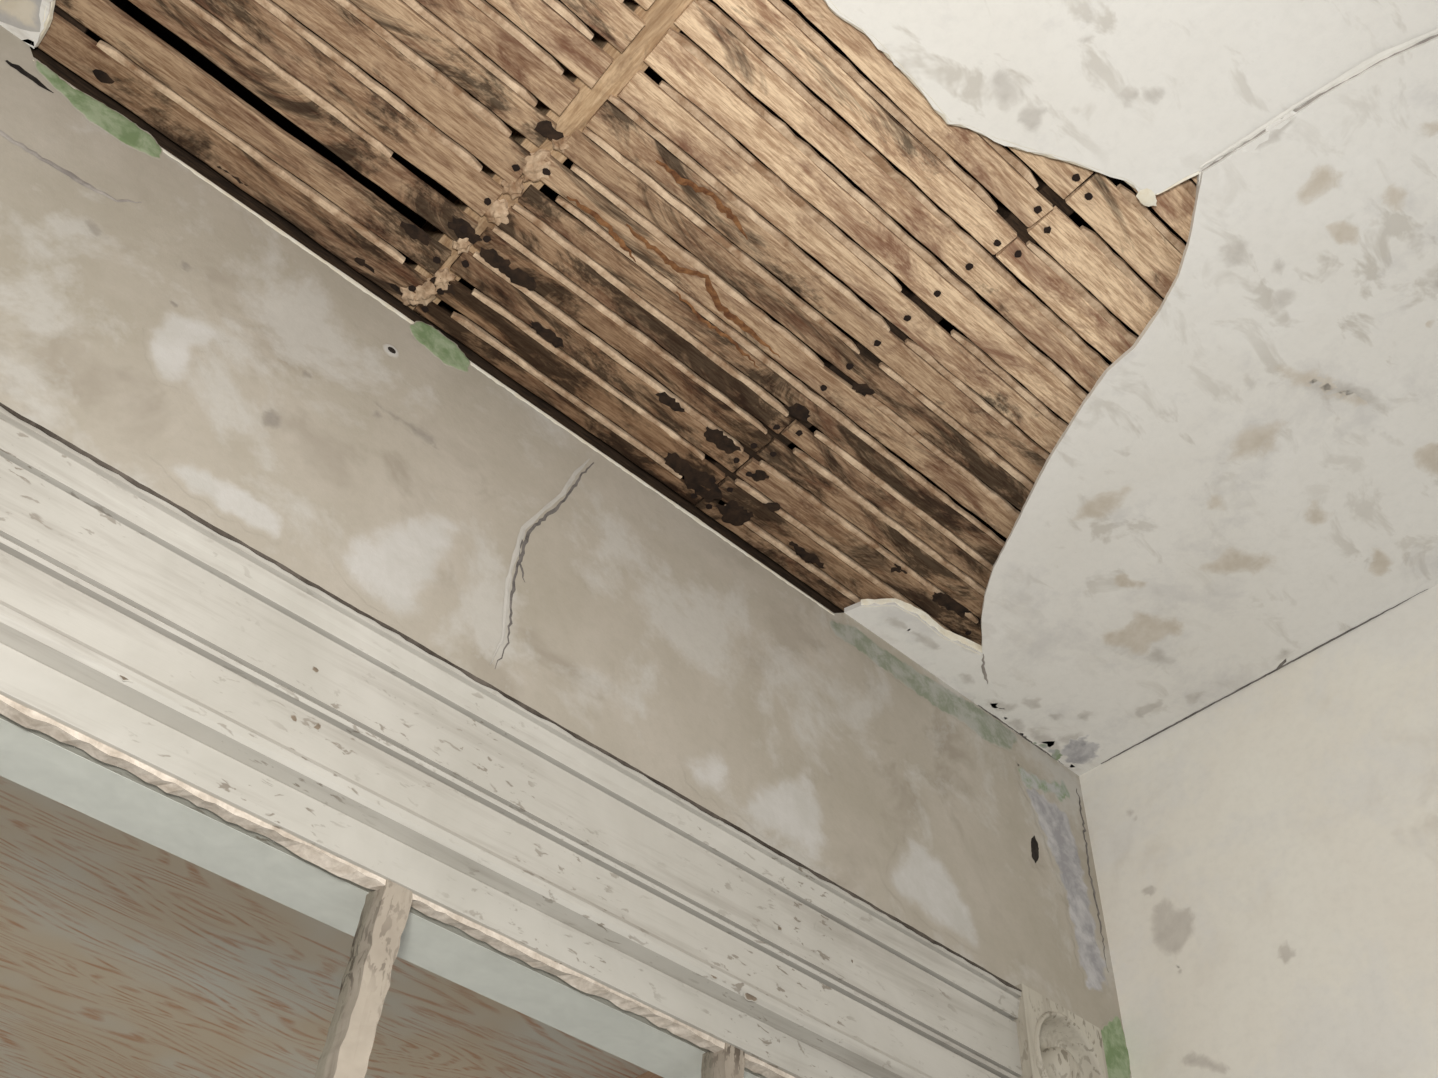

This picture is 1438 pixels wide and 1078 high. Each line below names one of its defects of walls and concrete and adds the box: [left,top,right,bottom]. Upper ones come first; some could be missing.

crack [0,130,142,203]
flaking render [824,0,1200,207]
crack [1200,29,1438,171]
crack [489,458,594,668]
peeling [24,0,1131,1078]